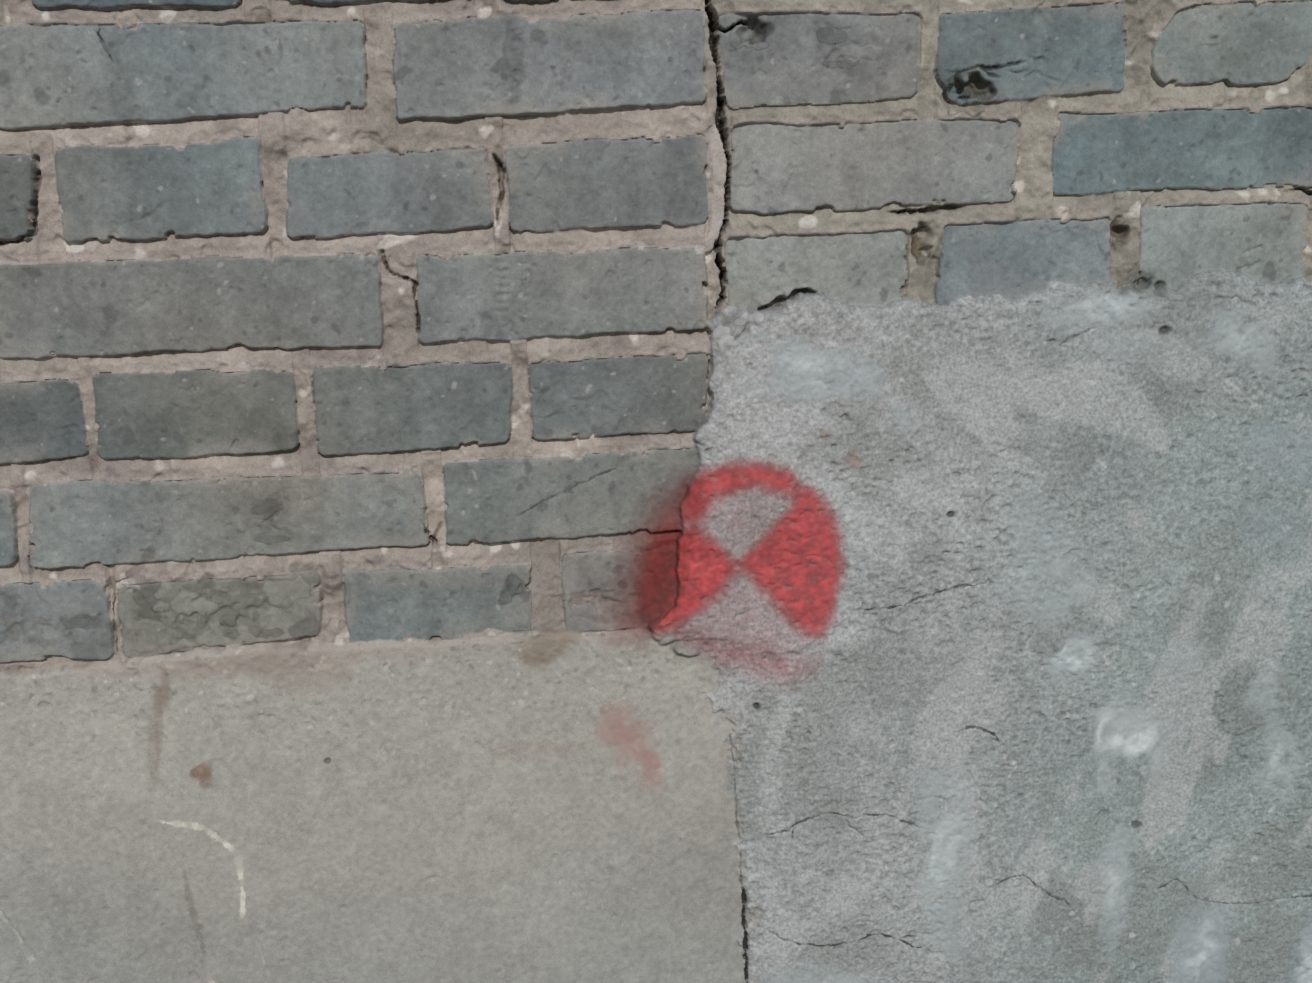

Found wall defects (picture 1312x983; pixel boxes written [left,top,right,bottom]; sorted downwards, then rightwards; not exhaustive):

crack [705,0,744,302]
crack [384,261,418,309]
crack [865,585,973,610]
crack [782,813,918,832]
crack [740,889,748,983]
crack [781,934,919,948]